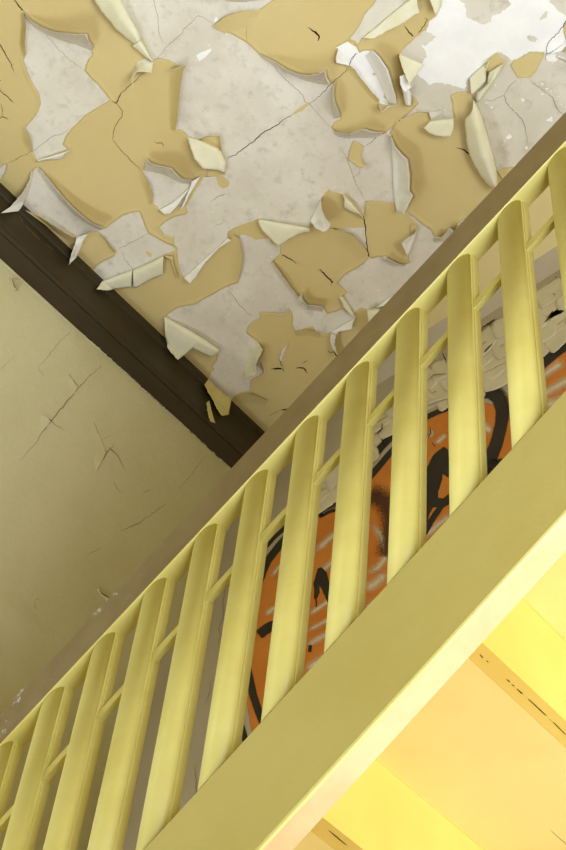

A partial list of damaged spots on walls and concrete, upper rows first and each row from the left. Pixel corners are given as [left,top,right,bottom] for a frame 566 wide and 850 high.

peeling [2,0,566,423]
spalling [0,259,231,469]
crack [20,366,101,461]
peeling [373,404,394,462]
peeling [319,464,339,514]